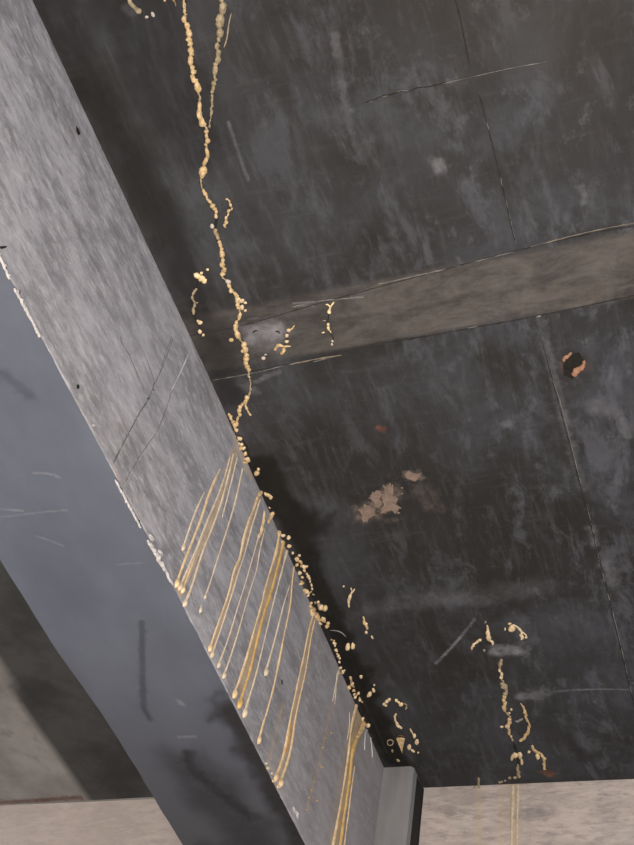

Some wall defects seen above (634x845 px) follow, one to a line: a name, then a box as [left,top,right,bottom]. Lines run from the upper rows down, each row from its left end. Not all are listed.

crack [111,0,634,706]
spalling [557,350,595,379]
damp [578,391,634,442]
peeling [342,467,450,530]
damp [229,417,408,766]
damp [343,563,568,639]
damp [471,621,535,660]
crack [394,714,419,753]
crack [498,659,546,780]
damp [218,703,305,845]